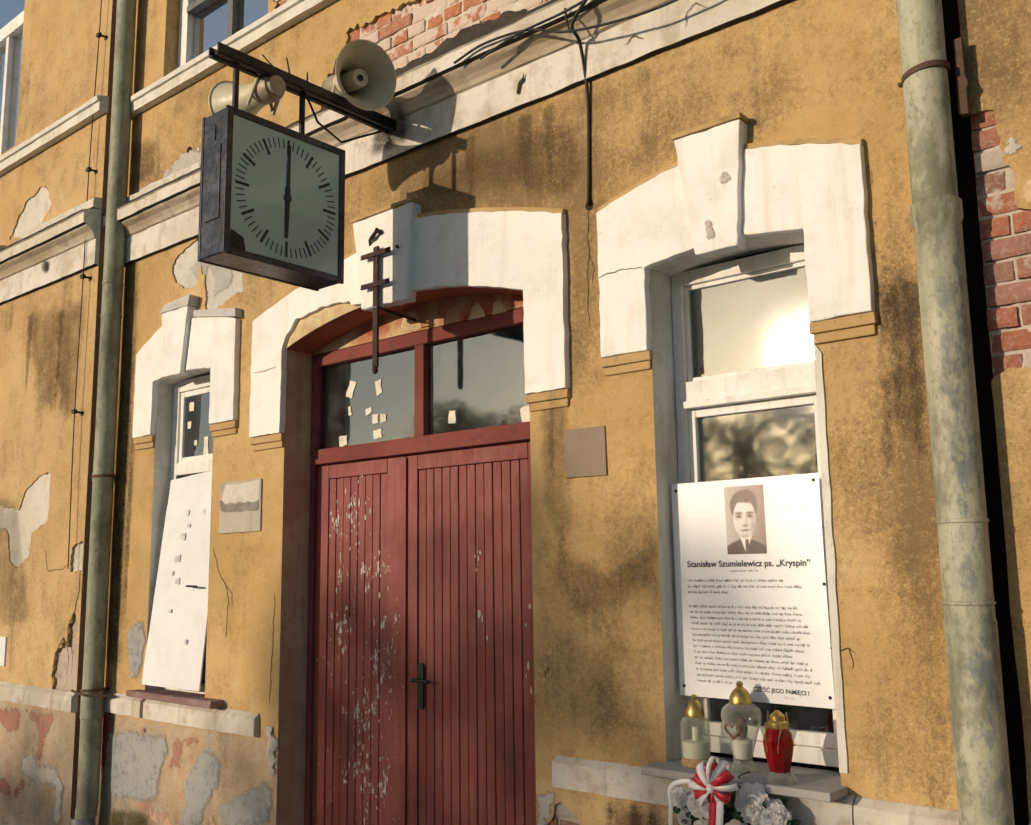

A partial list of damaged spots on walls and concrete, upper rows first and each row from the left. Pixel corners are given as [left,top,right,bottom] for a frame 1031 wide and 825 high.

flaking render [349,0,551,70]
spalling [163,146,201,178]
peeling [11,187,51,240]
peeling [174,240,243,309]
flaking render [970,111,1031,378]
peeling [0,472,50,567]
crack [45,551,80,678]
crack [213,548,232,630]
crack [268,595,276,702]
flaking render [547,802,580,825]